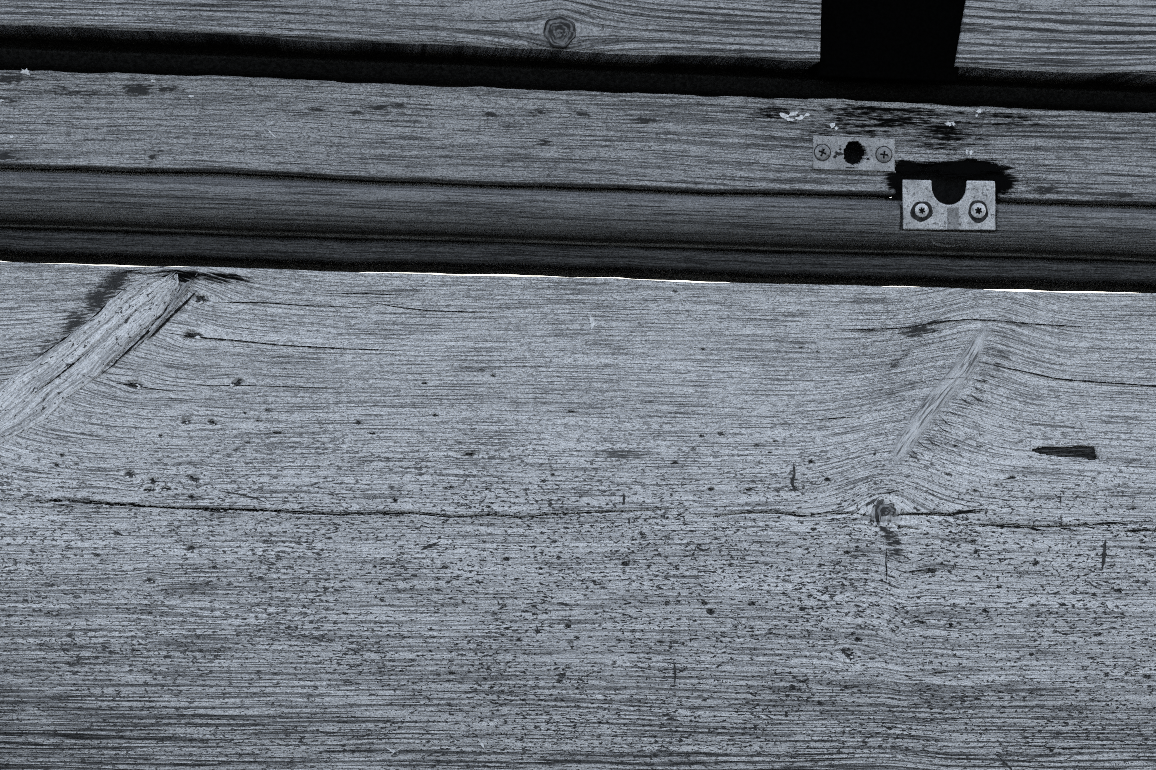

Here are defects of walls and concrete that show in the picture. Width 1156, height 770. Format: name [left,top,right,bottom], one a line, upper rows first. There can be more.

crack [838,319,1081,330]
crack [909,356,1156,458]
crack [8,488,1156,581]